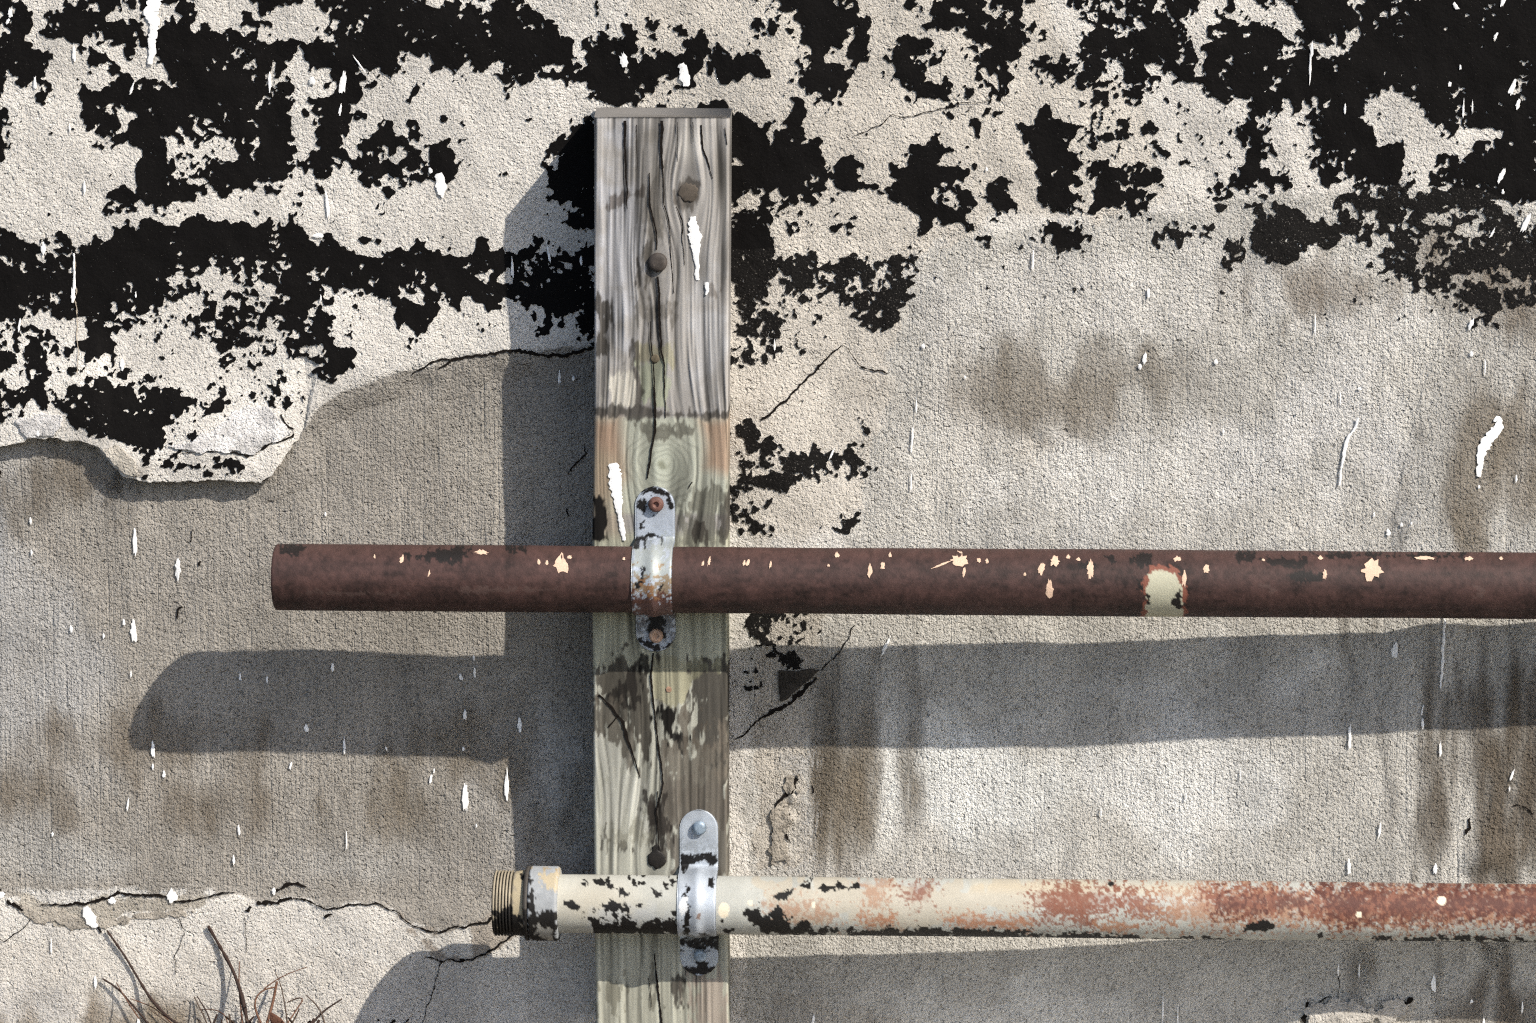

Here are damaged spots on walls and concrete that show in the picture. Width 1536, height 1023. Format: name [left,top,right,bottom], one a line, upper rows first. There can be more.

peeling [0,0,1536,483]
crack [761,345,889,420]
peeling [730,417,879,537]
leakage [800,684,874,860]
leakage [1420,661,1536,884]
crack [0,882,514,1023]
crack [1301,976,1340,1023]
leakage [1443,967,1523,1023]